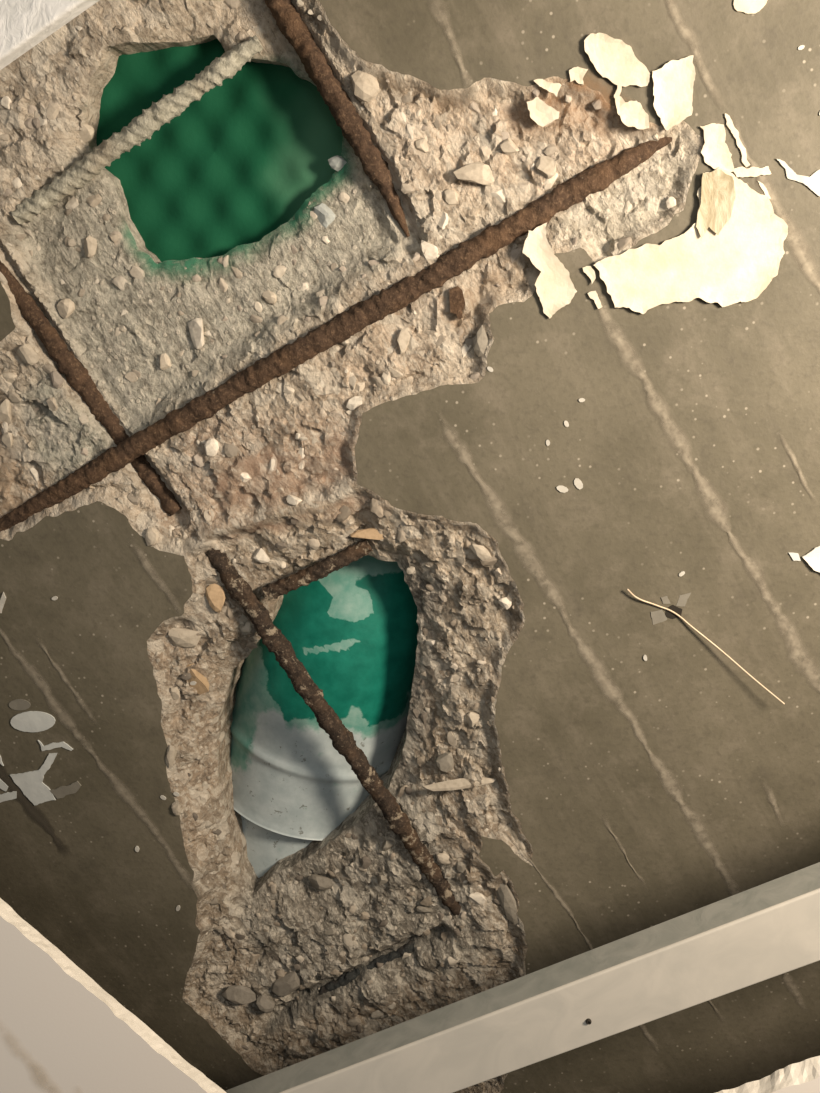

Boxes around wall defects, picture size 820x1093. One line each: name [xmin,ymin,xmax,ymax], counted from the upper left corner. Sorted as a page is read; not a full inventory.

spalling [0,0,788,556]
rust [449,286,465,320]
spalling [147,484,534,1076]
spalling [454,1073,508,1093]